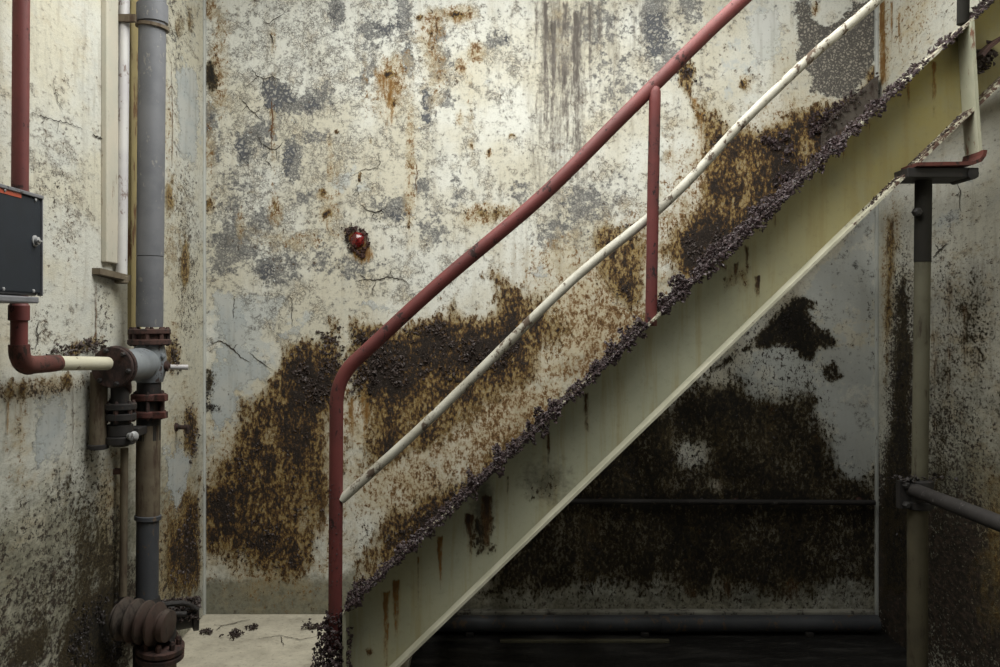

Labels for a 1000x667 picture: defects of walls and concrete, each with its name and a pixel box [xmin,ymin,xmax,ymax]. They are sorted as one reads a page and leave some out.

rust [0,377,29,430]
mould [0,466,126,667]
rust [40,371,90,400]
crack [212,340,274,371]
rust [206,315,383,584]
rust [349,420,537,589]
rust [343,265,573,475]
mould [477,274,912,605]
rust [722,245,760,293]
rust [662,59,865,279]